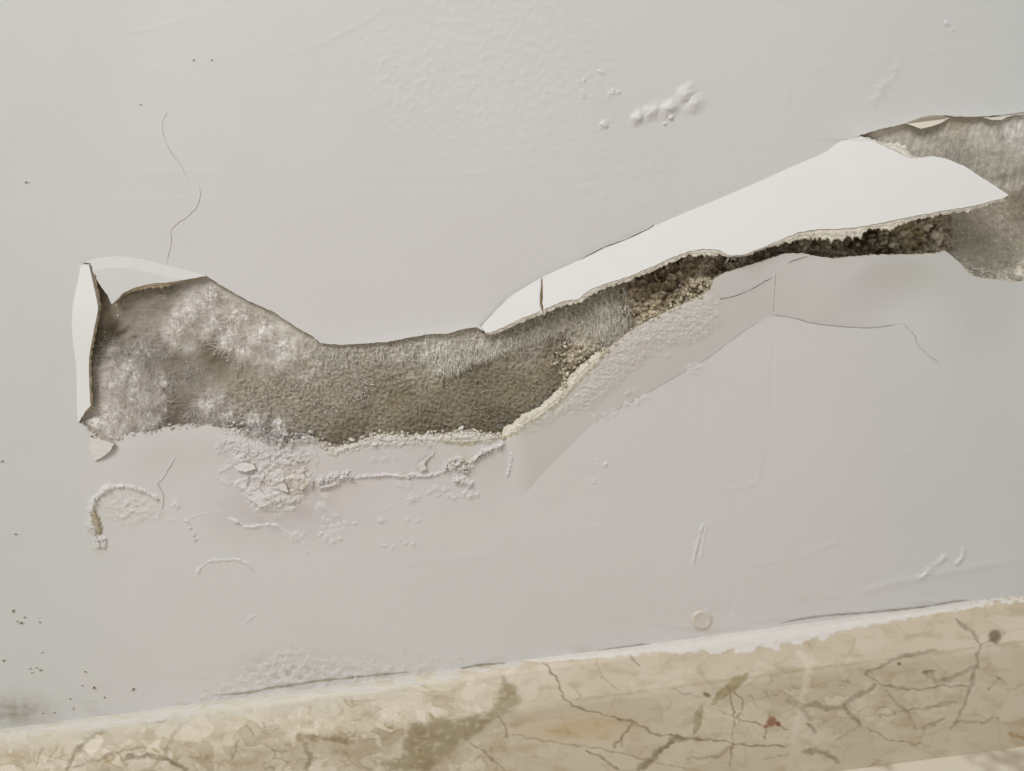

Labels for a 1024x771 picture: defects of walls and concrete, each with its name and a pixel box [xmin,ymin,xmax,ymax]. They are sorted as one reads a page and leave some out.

crack [160,109,201,264]
flaking render [72,112,1024,518]
crack [706,256,941,366]